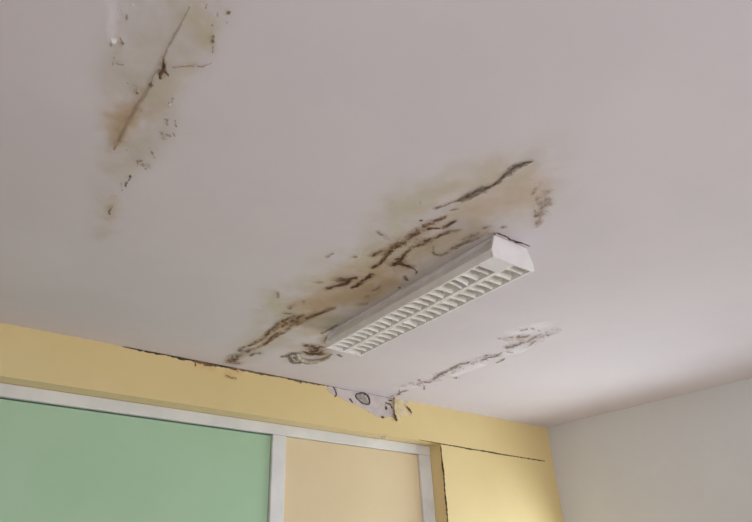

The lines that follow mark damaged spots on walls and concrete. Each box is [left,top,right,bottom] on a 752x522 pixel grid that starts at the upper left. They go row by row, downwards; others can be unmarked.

crack [113,7,209,149]
water stain [67,0,265,253]
crack [436,161,534,211]
water stain [196,111,617,369]
peeling [226,306,344,378]
crack [122,329,537,399]
spalling [327,386,412,421]
crack [421,440,544,522]